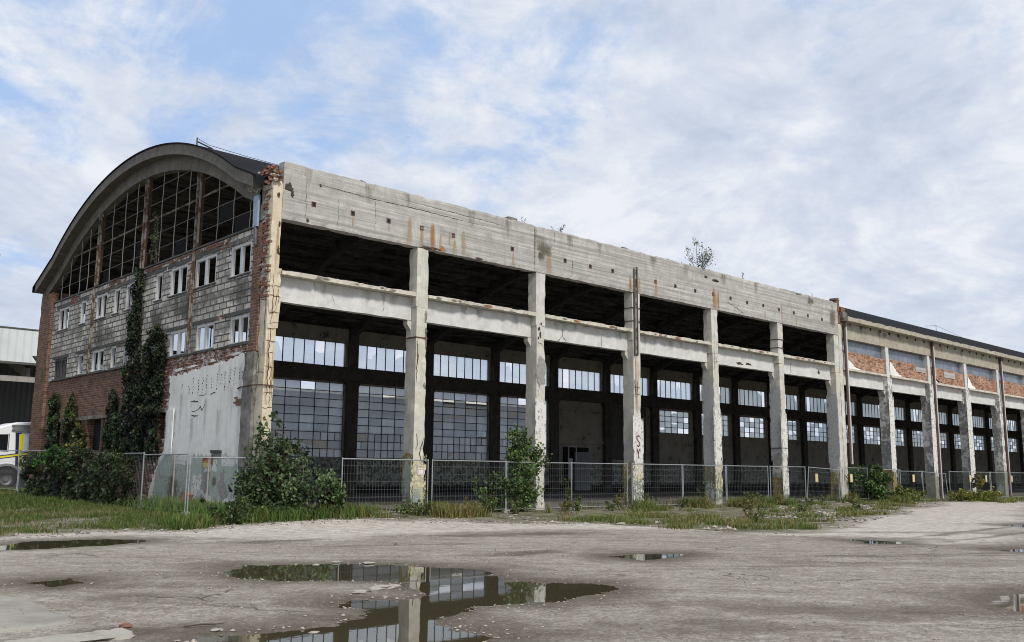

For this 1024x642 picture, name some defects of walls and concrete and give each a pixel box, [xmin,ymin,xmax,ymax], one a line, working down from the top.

rust [409,221,465,251]